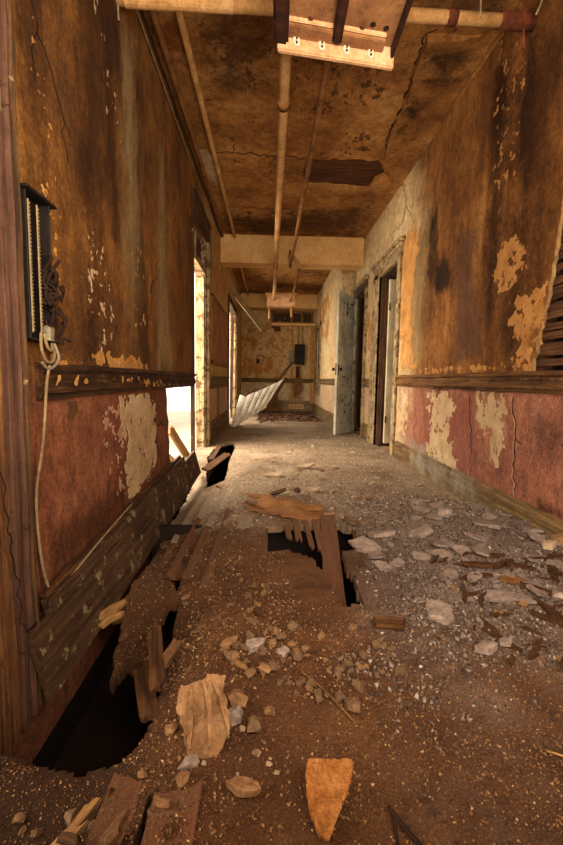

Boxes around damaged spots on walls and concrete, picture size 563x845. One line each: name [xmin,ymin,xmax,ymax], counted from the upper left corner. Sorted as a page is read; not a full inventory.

crack [385,30,436,149]
peeling [493,35,526,193]
peeling [81,235,114,322]
peeling [399,198,563,374]
peeling [92,329,170,499]
peeling [425,390,459,469]
peeling [475,390,508,468]
crack [510,394,521,498]